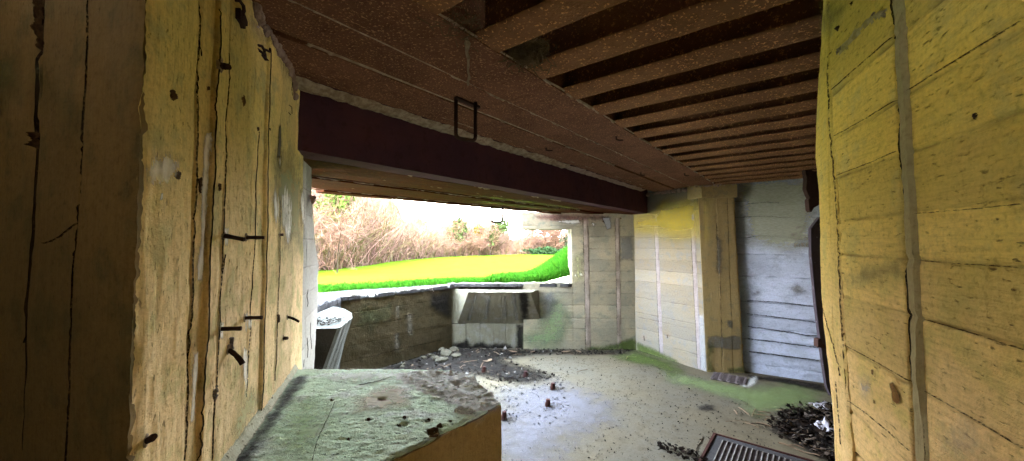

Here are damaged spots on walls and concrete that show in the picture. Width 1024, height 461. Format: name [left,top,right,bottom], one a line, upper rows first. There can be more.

corrosion [890,382,900,404]